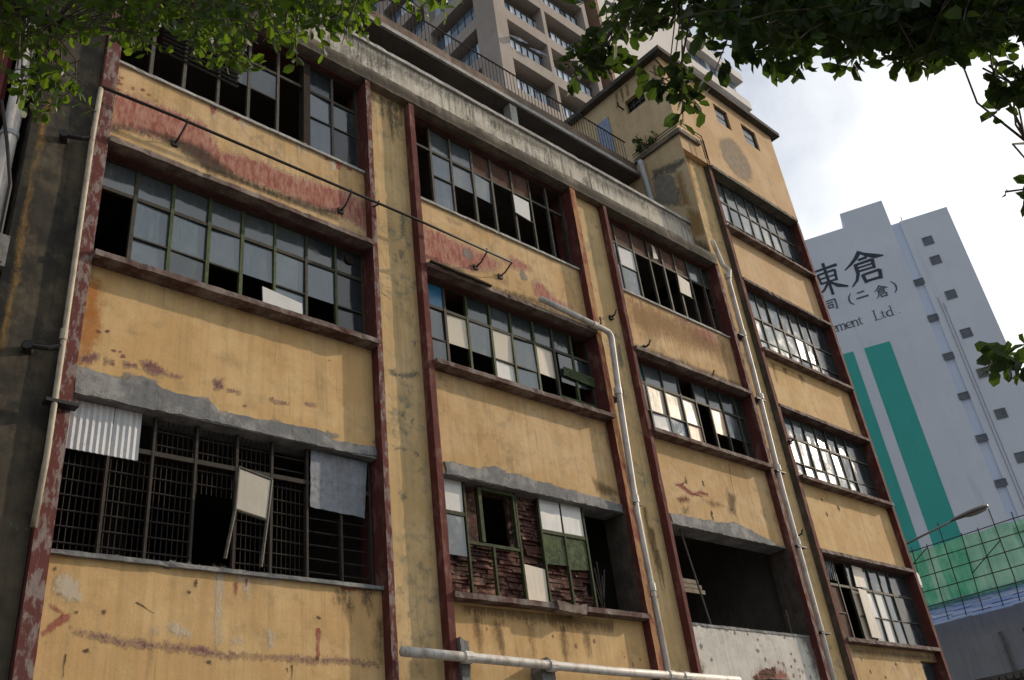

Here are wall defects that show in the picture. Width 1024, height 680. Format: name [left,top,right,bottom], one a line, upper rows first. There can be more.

peeling [79,349,183,379]
peeling [213,378,246,407]